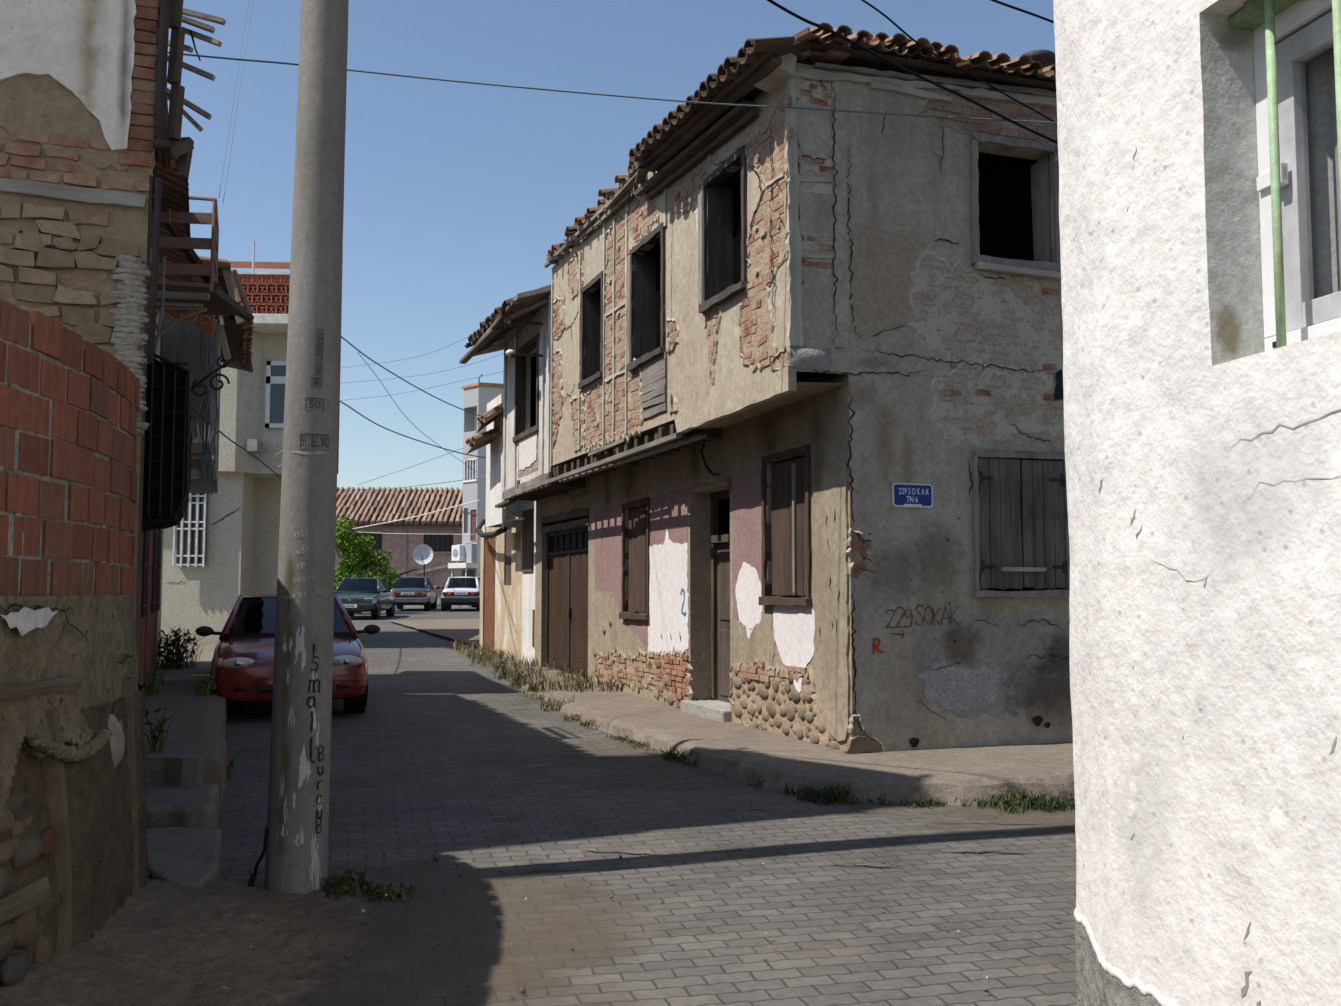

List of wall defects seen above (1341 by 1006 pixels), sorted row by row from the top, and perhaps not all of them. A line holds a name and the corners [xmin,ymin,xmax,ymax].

spalling [915,91,1058,145]
spalling [738,78,833,374]
spalling [518,153,713,478]
spalling [704,305,722,385]
crack [712,80,1053,736]
spalling [908,251,1064,449]
crack [1226,409,1341,455]
crack [1242,475,1341,503]
spalling [593,590,693,708]